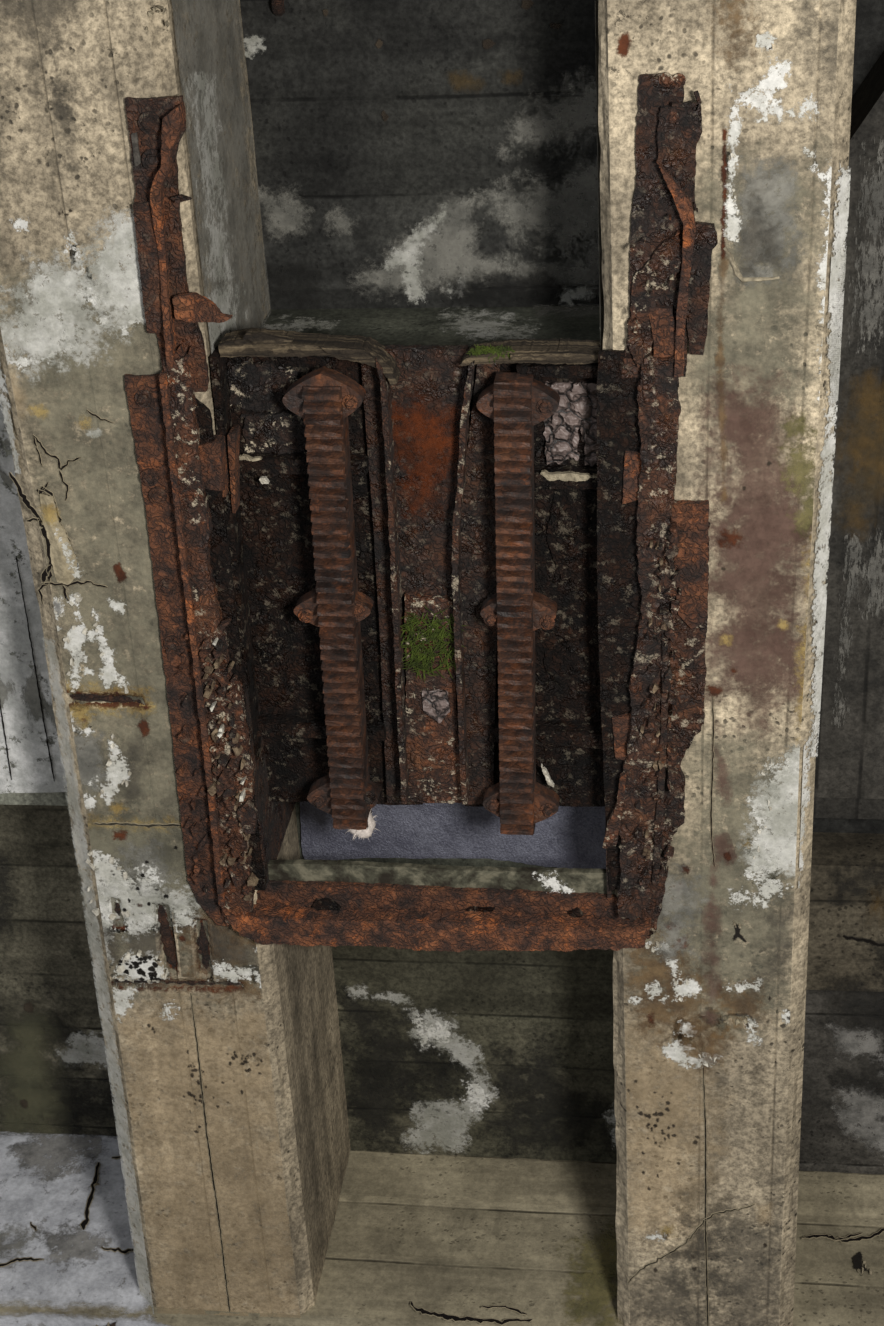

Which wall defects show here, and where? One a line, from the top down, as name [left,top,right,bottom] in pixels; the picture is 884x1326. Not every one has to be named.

leakage [721,0,820,155]
leakage [356,0,604,349]
crack [9,435,108,604]
rust [649,522,682,661]
leakage [628,140,884,1069]
leakage [0,213,262,1326]
rust [185,630,259,901]
rust [177,908,260,999]
rust [630,815,761,1068]
crack [843,935,884,946]
crack [0,1222,44,1267]
crack [80,1155,135,1254]